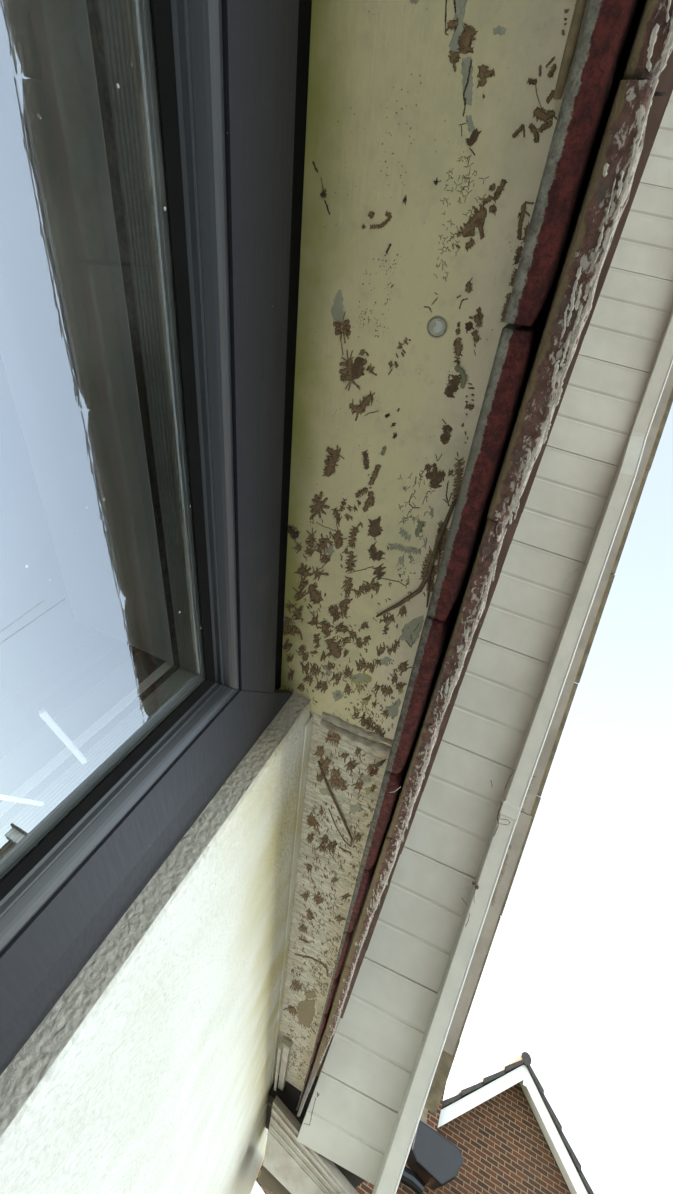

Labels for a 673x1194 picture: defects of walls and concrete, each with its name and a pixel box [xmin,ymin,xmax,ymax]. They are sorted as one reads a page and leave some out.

peeling [449,0,475,134]
peeling [389,506,433,585]
peeling [399,615,424,647]
peeling [352,688,403,738]
peeling [284,980,316,1027]